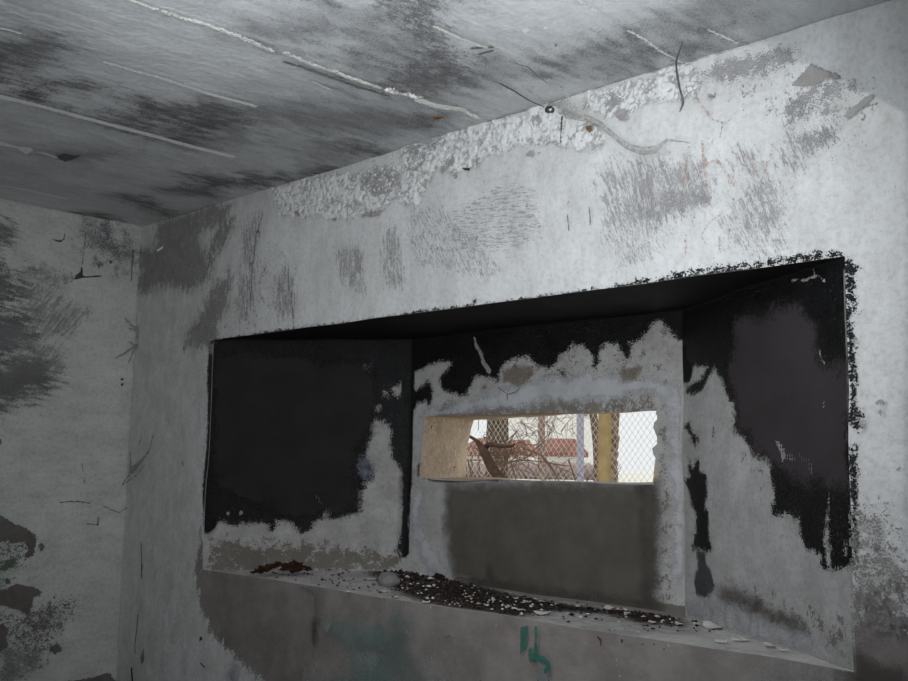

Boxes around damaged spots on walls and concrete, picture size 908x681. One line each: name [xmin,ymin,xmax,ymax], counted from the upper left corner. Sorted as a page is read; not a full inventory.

peeling [361,0,486,99]
peeling [271,43,798,291]
peeling [774,63,874,179]
peeling [138,201,908,659]